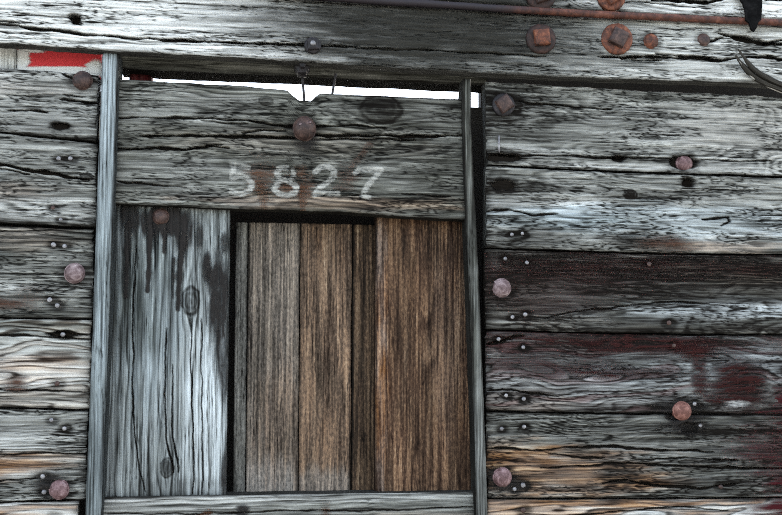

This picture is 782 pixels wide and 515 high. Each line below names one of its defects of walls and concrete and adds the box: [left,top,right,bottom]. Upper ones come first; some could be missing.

peeling [17,49,102,77]
crack [600,34,782,63]
crack [0,163,89,181]
leakage [120,206,193,311]